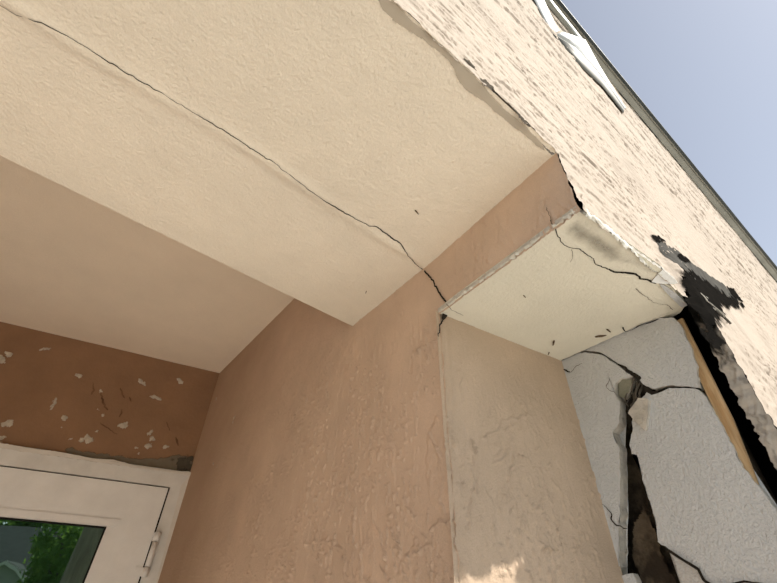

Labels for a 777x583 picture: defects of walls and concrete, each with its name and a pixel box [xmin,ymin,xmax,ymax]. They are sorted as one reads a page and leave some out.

crack [1,6,459,337]
crack [546,209,777,470]
mould [678,254,745,350]
spalling [65,430,193,472]
crack [602,504,710,583]